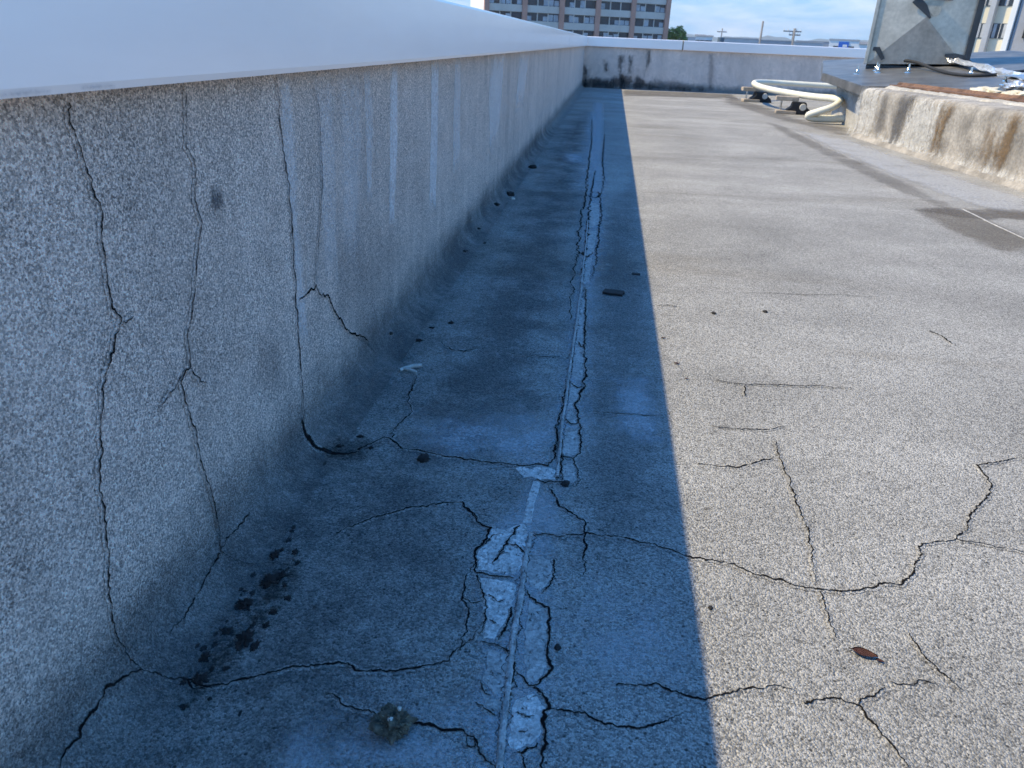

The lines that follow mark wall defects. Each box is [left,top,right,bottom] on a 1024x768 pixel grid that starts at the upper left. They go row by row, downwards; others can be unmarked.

water stain [583,56,686,91]
rust [885,82,1024,169]
crack [54,83,965,768]
spalling [477,298,585,750]